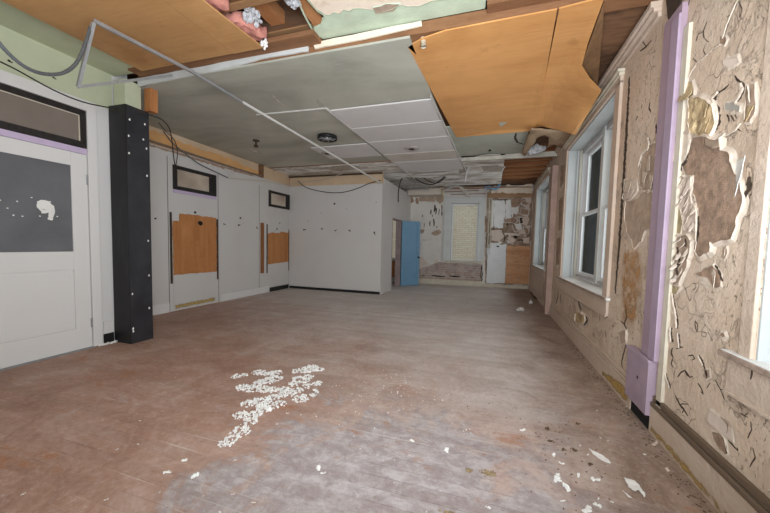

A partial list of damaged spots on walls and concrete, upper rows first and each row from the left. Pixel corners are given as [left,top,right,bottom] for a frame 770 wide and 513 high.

peeling [308,0,443,16]
peeling [719,34,741,71]
peeling [677,78,698,102]
peeling [724,81,761,125]
flaking render [622,142,656,250]
flaking render [668,130,752,296]
flaking render [419,197,533,286]
peeling [706,407,735,457]